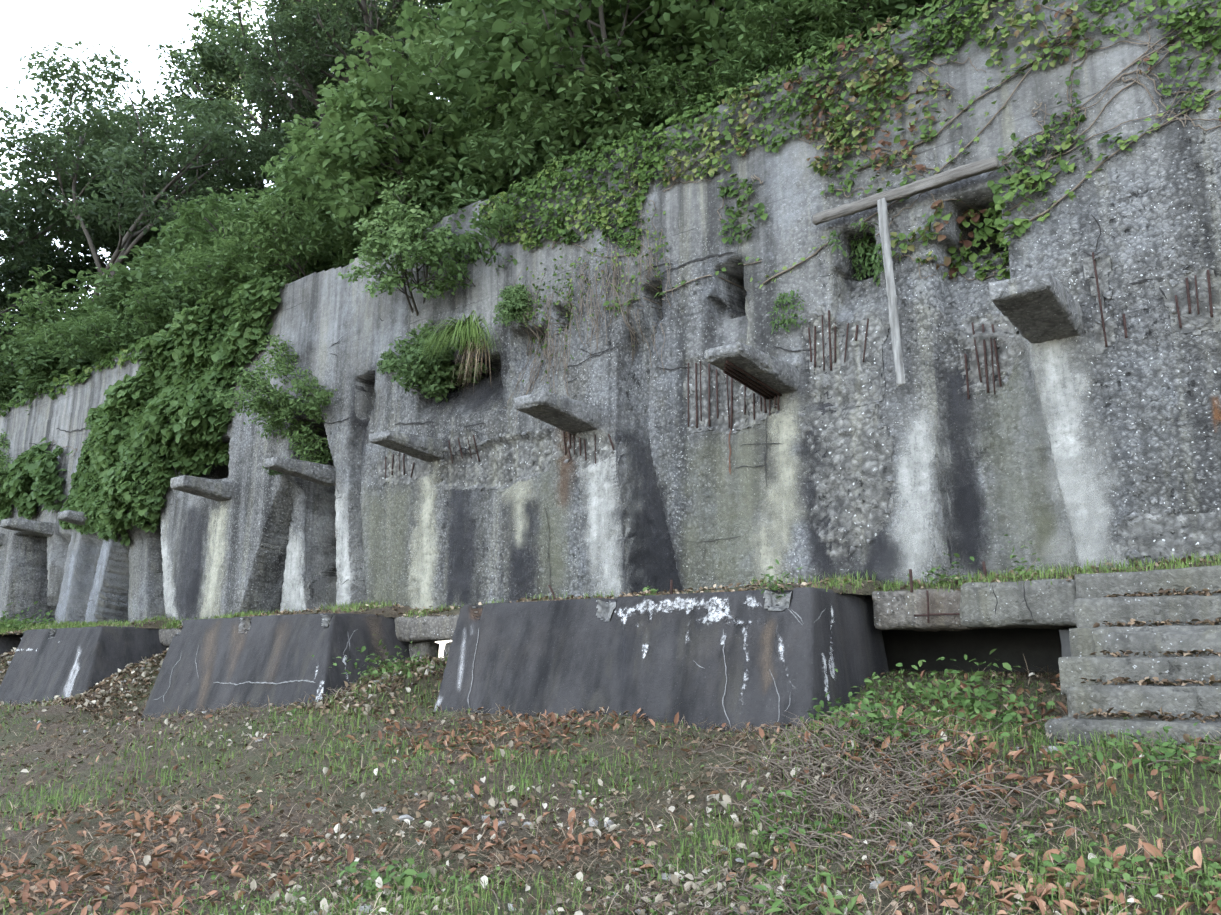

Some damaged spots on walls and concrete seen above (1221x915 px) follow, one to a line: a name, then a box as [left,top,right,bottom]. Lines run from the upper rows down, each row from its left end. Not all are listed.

leakage [864,369,983,580]
leakage [581,433,759,645]
spalling [596,600,617,622]
spalling [763,590,793,611]
crack [154,645,315,700]